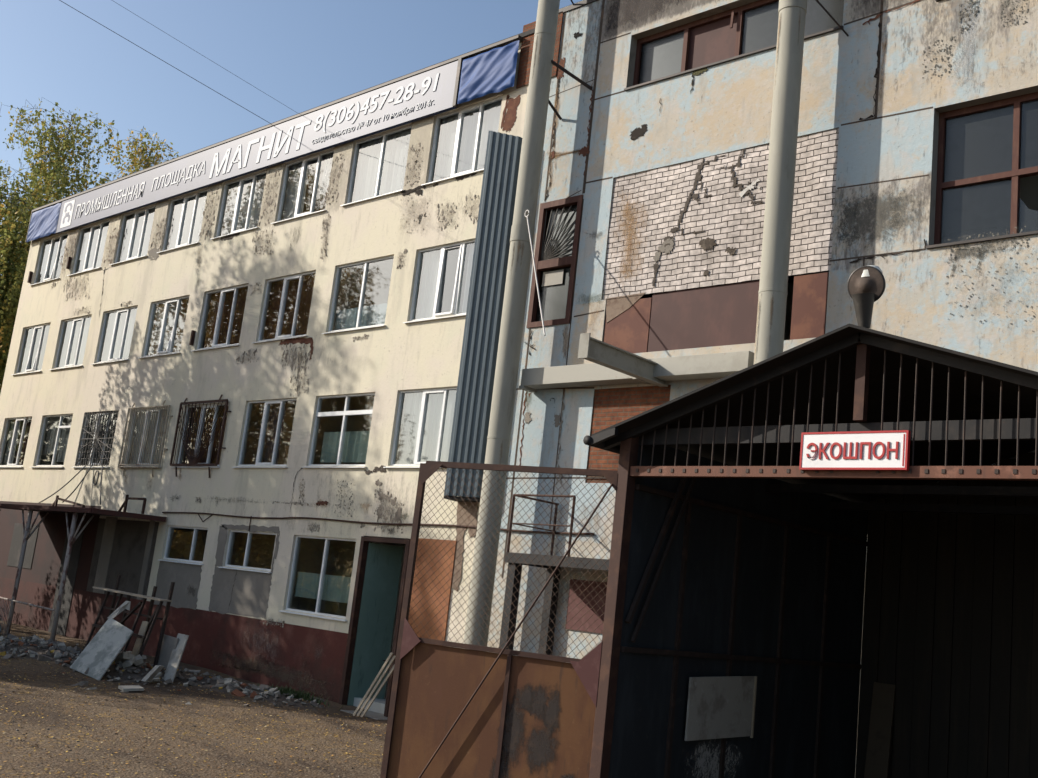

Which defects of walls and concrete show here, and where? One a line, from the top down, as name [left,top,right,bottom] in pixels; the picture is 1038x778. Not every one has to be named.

flaking render [501,21,536,132]
flaking render [551,11,565,80]
water stain [608,0,681,29]
spalling [630,124,647,140]
spalling [400,143,480,234]
crack [652,148,763,286]
water stain [838,190,920,247]
spalling [279,337,314,396]
peeling [272,465,405,534]